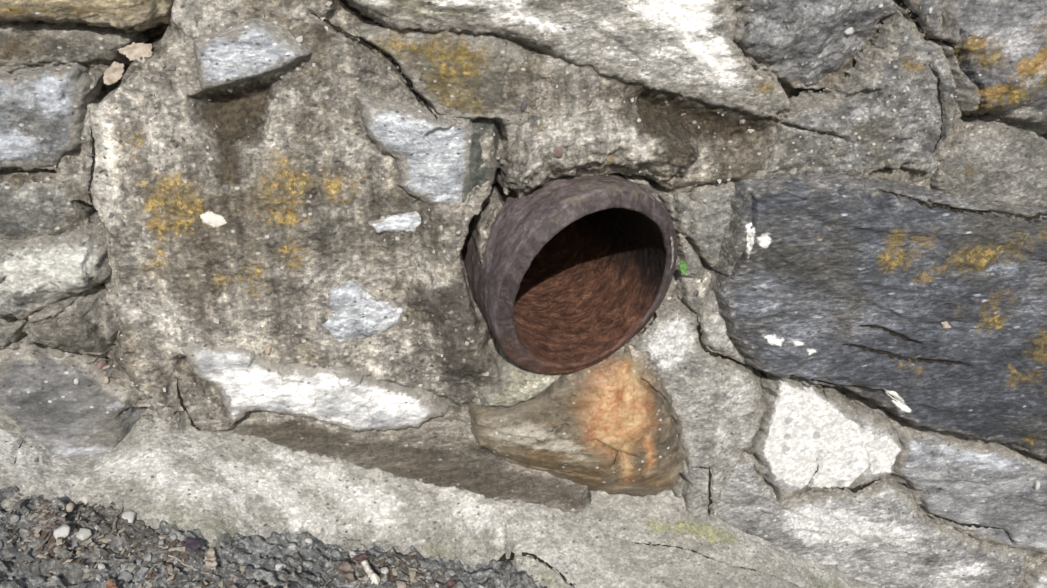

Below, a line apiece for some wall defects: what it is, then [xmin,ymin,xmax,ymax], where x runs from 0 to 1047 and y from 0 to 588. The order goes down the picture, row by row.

crack [893,0,965,153]
crack [766,118,846,139]
crack [879,189,1047,220]
crack [843,325,969,367]
corrosion [552,356,654,483]
crack [495,551,575,588]
crack [633,542,796,585]